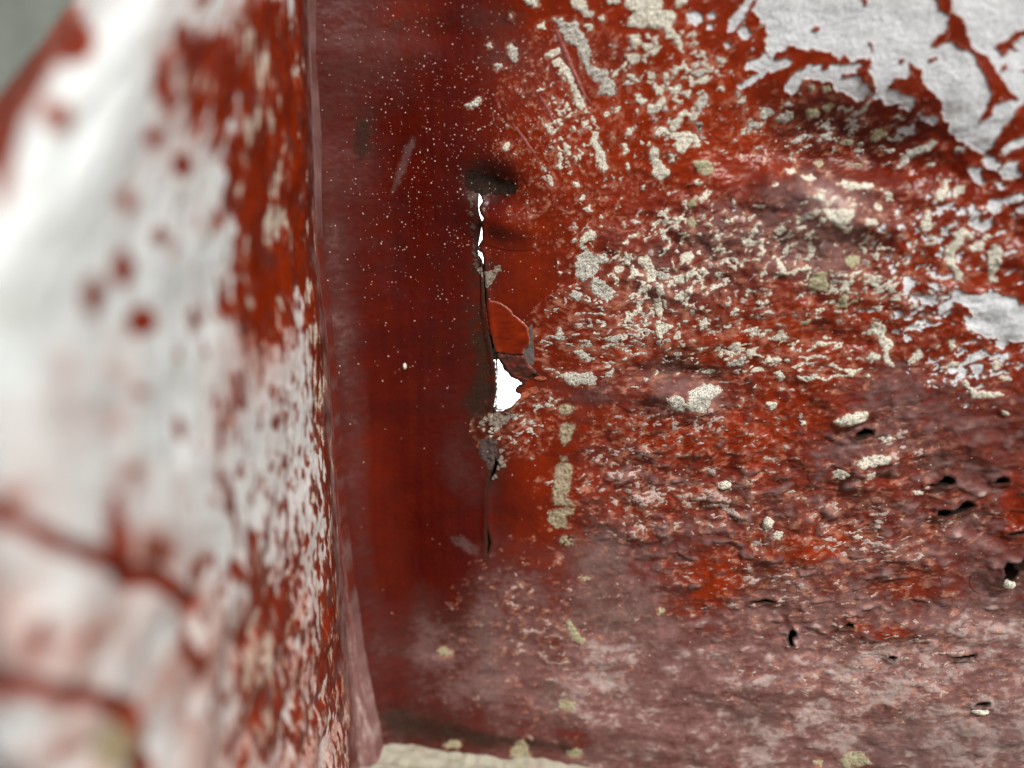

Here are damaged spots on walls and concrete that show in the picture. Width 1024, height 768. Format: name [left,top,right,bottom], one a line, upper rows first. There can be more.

crack [477,194,486,303]
peeling [464,0,1024,735]
crack [489,458,498,481]
peeling [436,634,454,657]